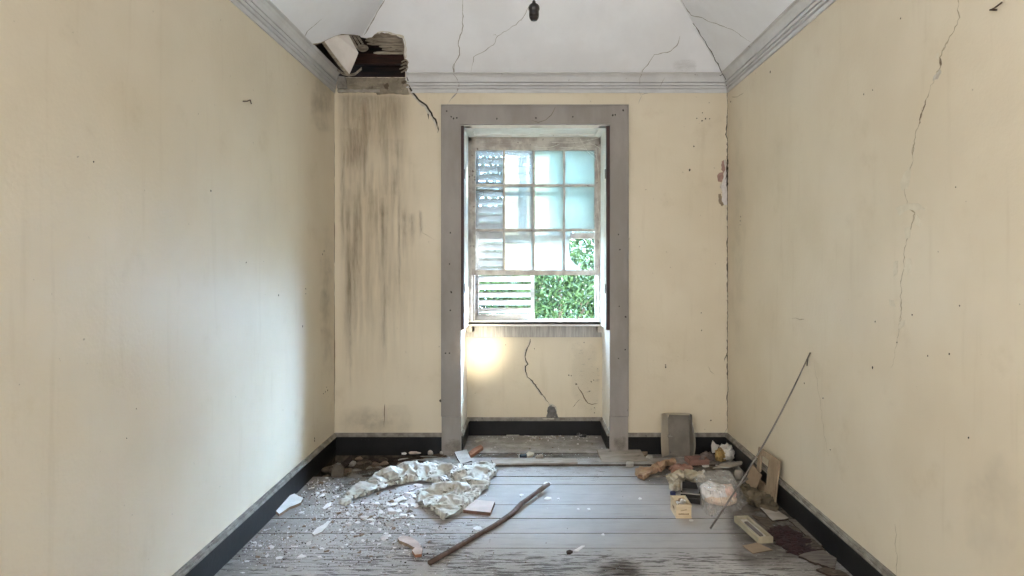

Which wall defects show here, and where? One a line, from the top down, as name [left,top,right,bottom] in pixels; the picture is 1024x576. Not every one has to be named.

flaking render [313,31,410,95]
crack [405,4,528,131]
crack [639,3,750,435]
flaking render [717,159,728,206]
crack [889,0,960,360]
crack [524,339,596,407]